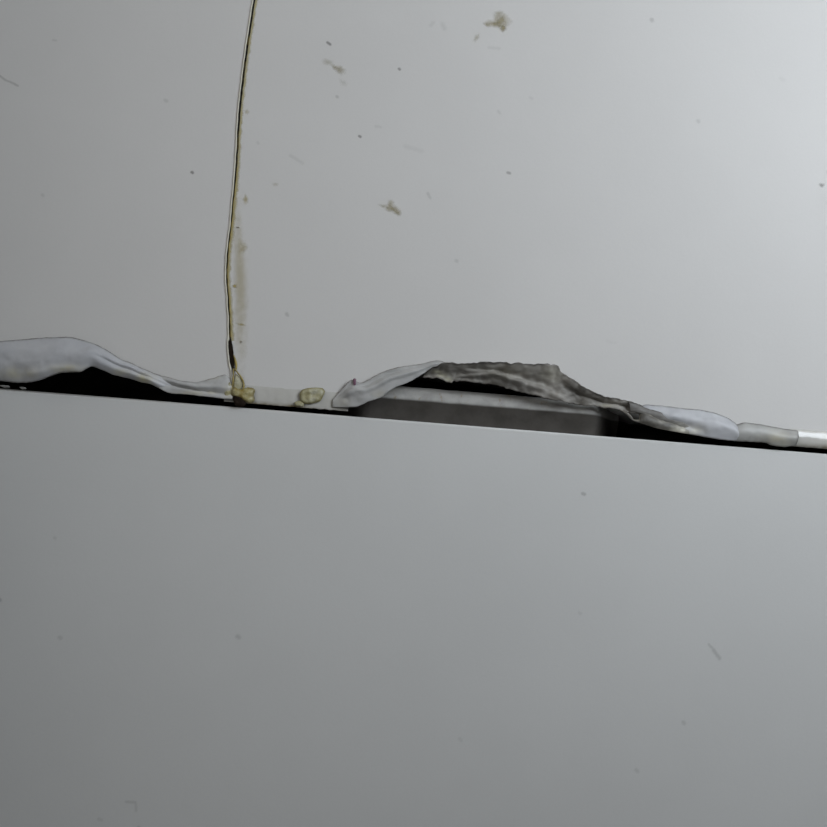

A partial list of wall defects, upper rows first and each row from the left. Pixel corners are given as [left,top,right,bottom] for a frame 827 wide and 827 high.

crack [224,0,257,389]
peeling [332,360,799,447]